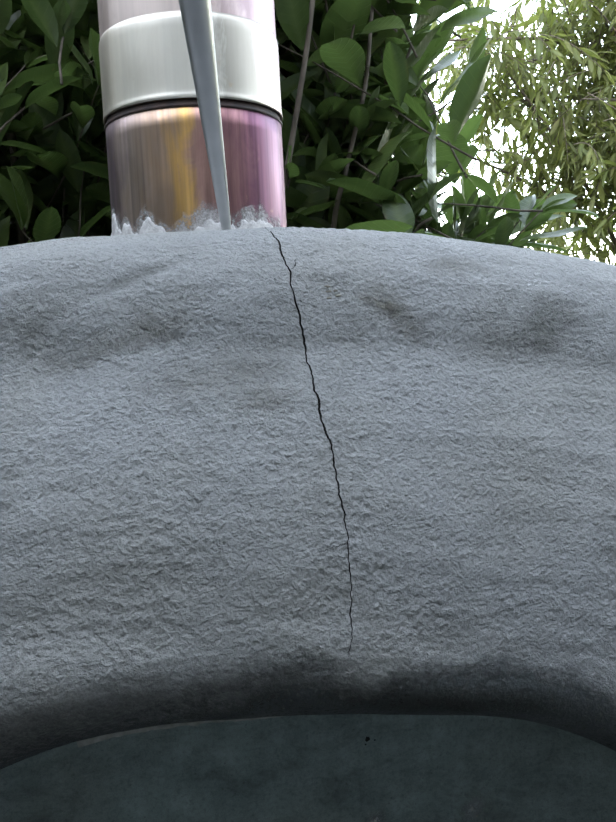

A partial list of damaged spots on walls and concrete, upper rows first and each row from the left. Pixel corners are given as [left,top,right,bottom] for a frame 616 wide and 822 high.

crack [263,227,353,653]